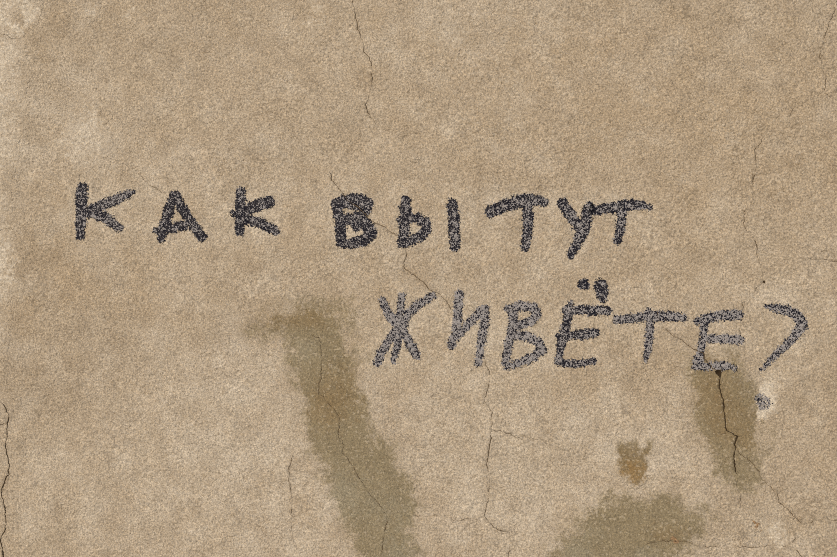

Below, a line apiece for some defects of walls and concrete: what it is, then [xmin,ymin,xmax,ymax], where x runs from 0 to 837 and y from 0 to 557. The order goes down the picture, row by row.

crack [352,1,427,134]
crack [0,402,10,557]
leakage [225,282,441,557]
leakage [535,330,790,557]
crack [647,312,835,556]